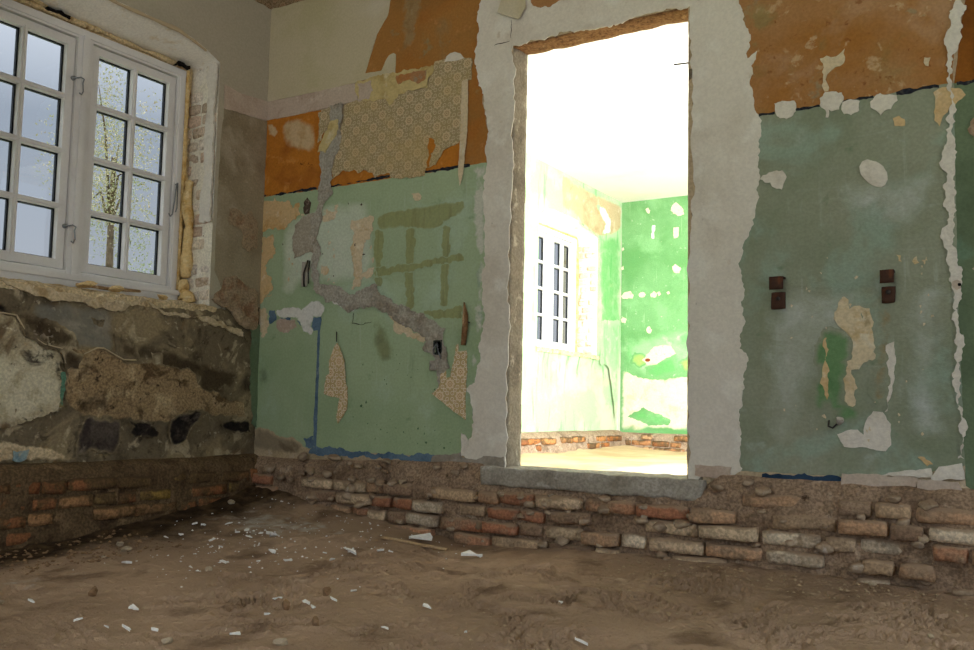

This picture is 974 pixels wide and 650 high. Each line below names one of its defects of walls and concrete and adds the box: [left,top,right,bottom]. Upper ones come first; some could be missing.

peeling [743,0,783,51]
peeling [267,116,320,176]
peeling [561,174,622,238]
spalling [671,203,684,238]
peeling [469,163,487,374]
peeling [0,312,248,463]